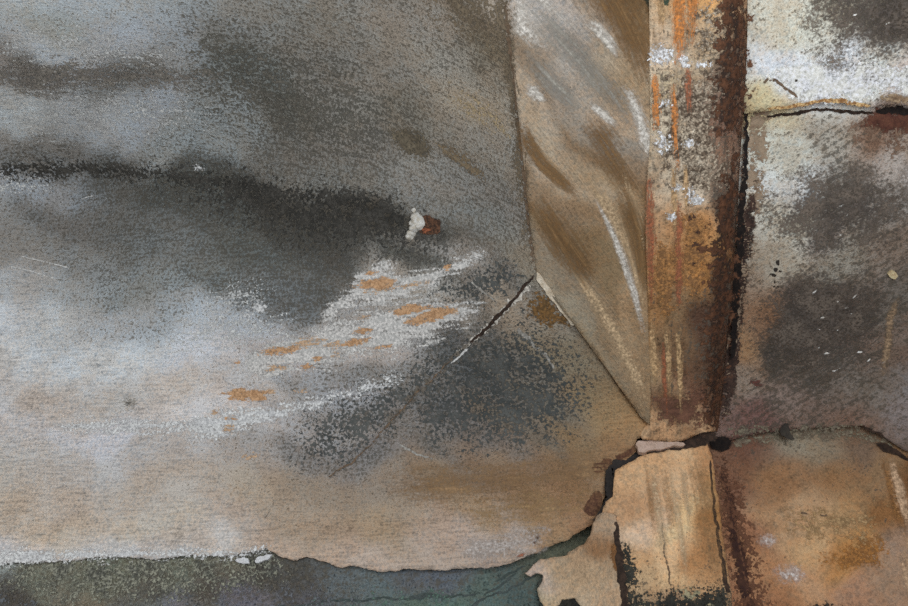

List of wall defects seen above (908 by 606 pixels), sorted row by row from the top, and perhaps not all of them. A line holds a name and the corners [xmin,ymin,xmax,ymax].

water stain [0,16,491,183]
water stain [0,154,601,561]
crack [328,0,537,477]
water stain [447,81,572,192]
corrosion [657,0,698,65]
corrosion [645,69,713,320]
water stain [512,0,908,432]
crack [593,78,908,606]
peeling [235,554,273,564]
peeling [525,491,622,606]